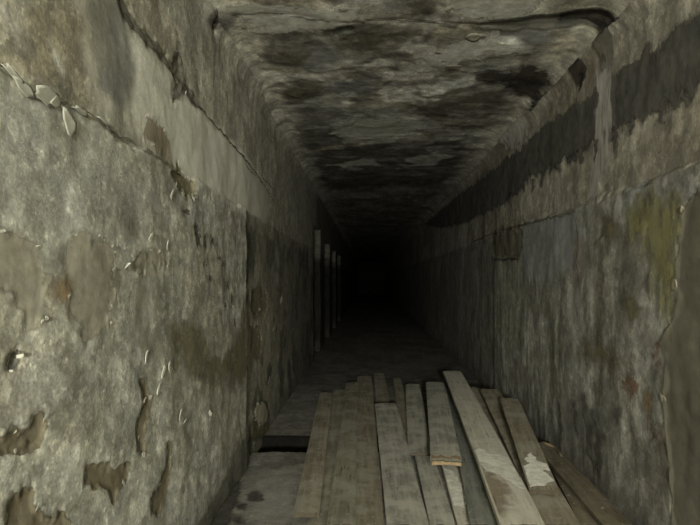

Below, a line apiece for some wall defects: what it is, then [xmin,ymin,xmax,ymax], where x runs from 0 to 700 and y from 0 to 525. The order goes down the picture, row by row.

peeling [0,62,197,202]
crack [119,0,278,204]
water stain [425,13,700,394]
peeling [64,226,170,343]
peeling [8,349,25,372]
flaking render [170,309,248,392]
peeling [0,411,50,456]
peeling [137,361,172,457]
peeling [6,480,71,525]
peeling [85,460,130,505]
peeling [152,440,173,518]